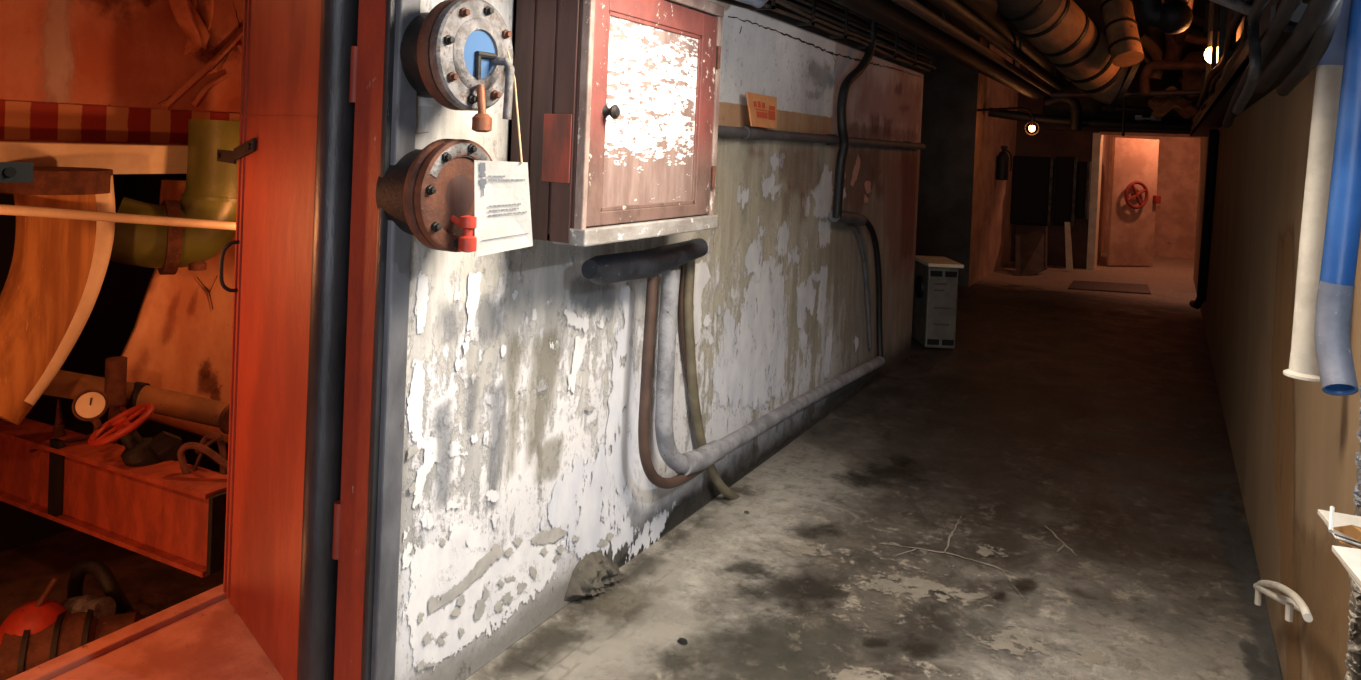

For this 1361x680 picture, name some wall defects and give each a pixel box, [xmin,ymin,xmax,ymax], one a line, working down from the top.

peeling [399,270,676,672]
damp [497,373,883,673]
spalling [1353,385,1361,516]